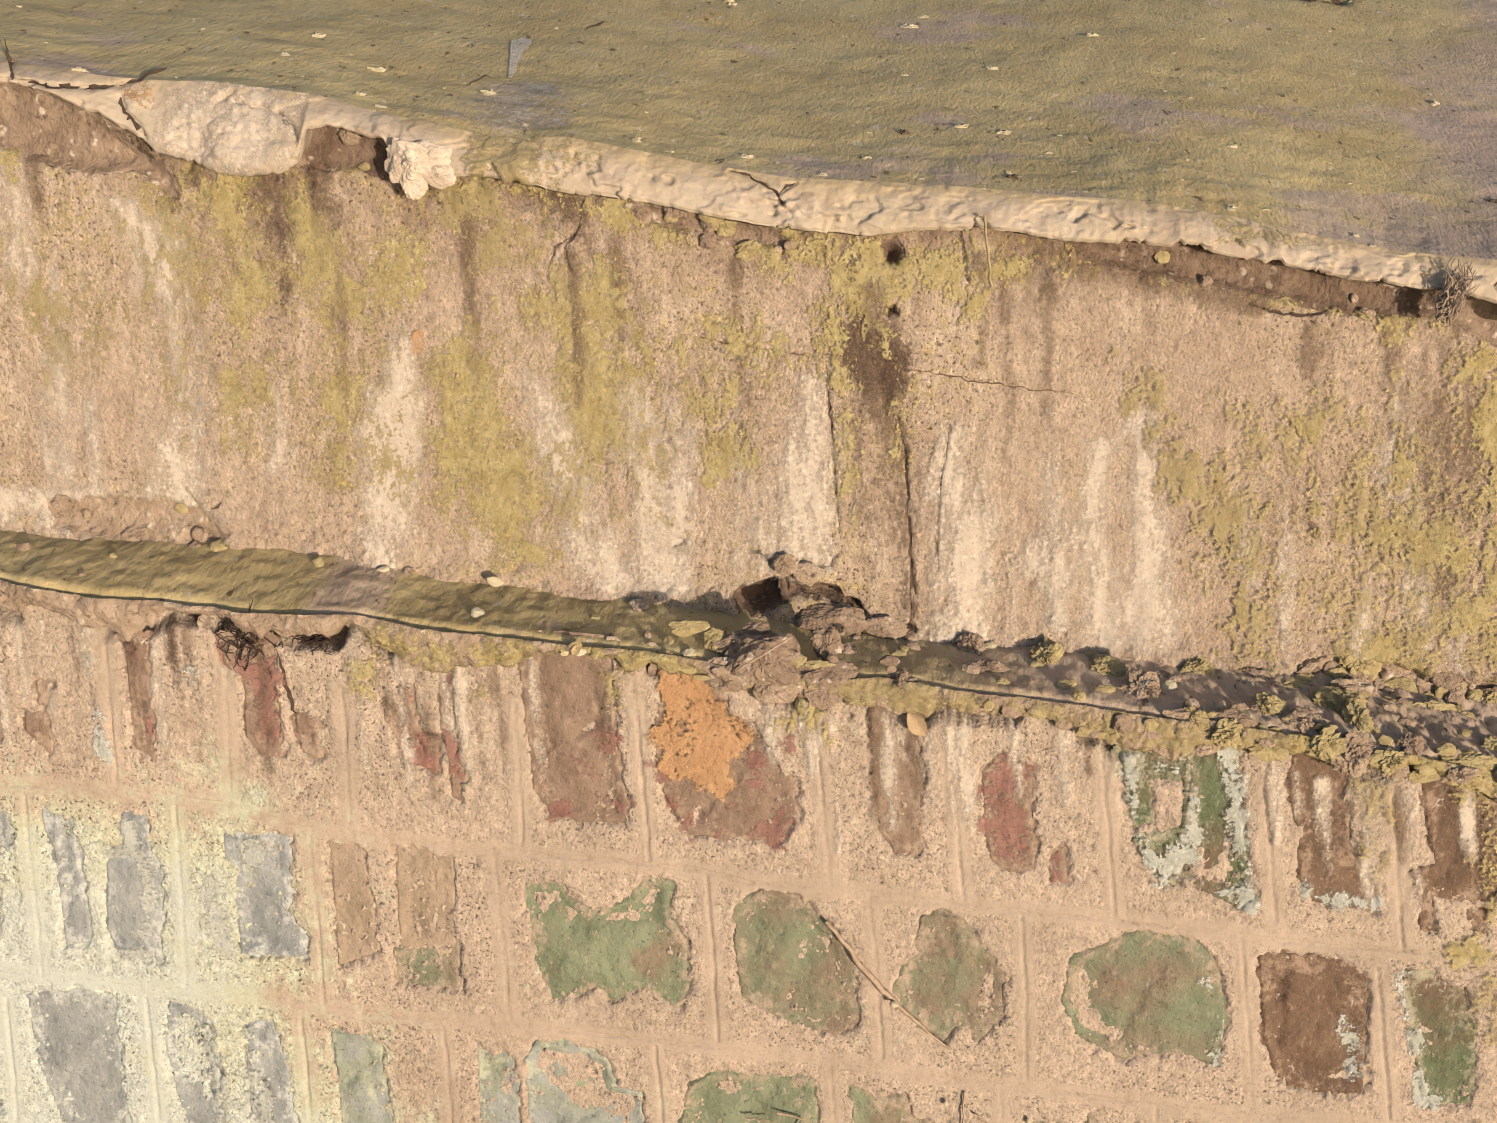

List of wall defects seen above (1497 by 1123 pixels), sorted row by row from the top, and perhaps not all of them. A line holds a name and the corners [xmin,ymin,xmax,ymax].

crack [1300,0,1361,8]
spalling [0,83,180,199]
spalling [294,126,390,181]
efflorescence [353,329,426,569]
damp [523,240,700,600]
spalling [730,575,863,618]
damp [734,257,909,585]
crack [898,416,949,620]
damp [919,422,1005,644]
crack [904,370,1077,395]
damp [1012,410,1182,657]
spalling [1063,241,1497,347]